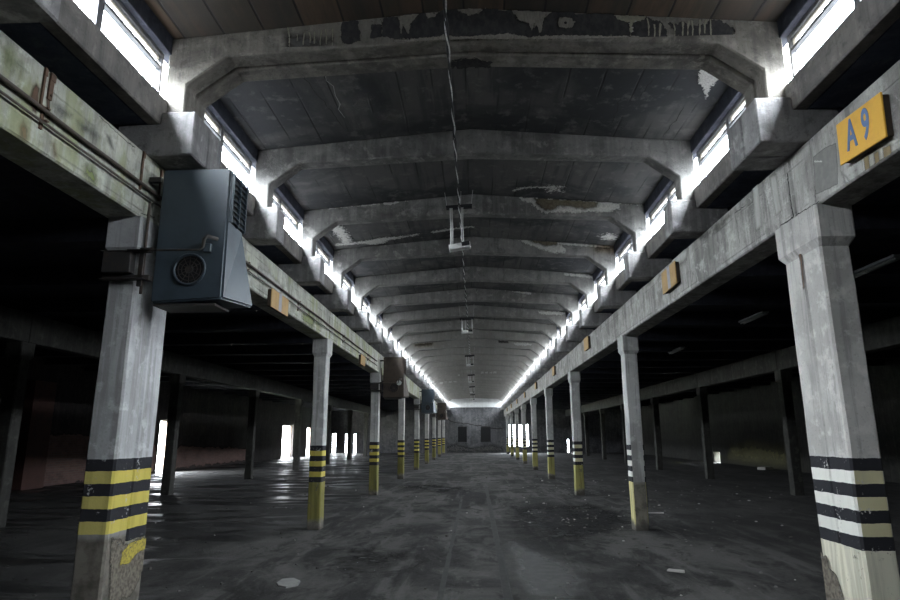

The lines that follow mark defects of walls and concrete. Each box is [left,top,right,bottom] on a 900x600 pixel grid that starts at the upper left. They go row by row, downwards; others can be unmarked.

peeling [394,10,646,43]
spalling [698,70,719,99]
peeling [519,197,642,214]
spalling [332,225,354,243]
spalling [109,536,146,600]
spalling [820,551,844,600]